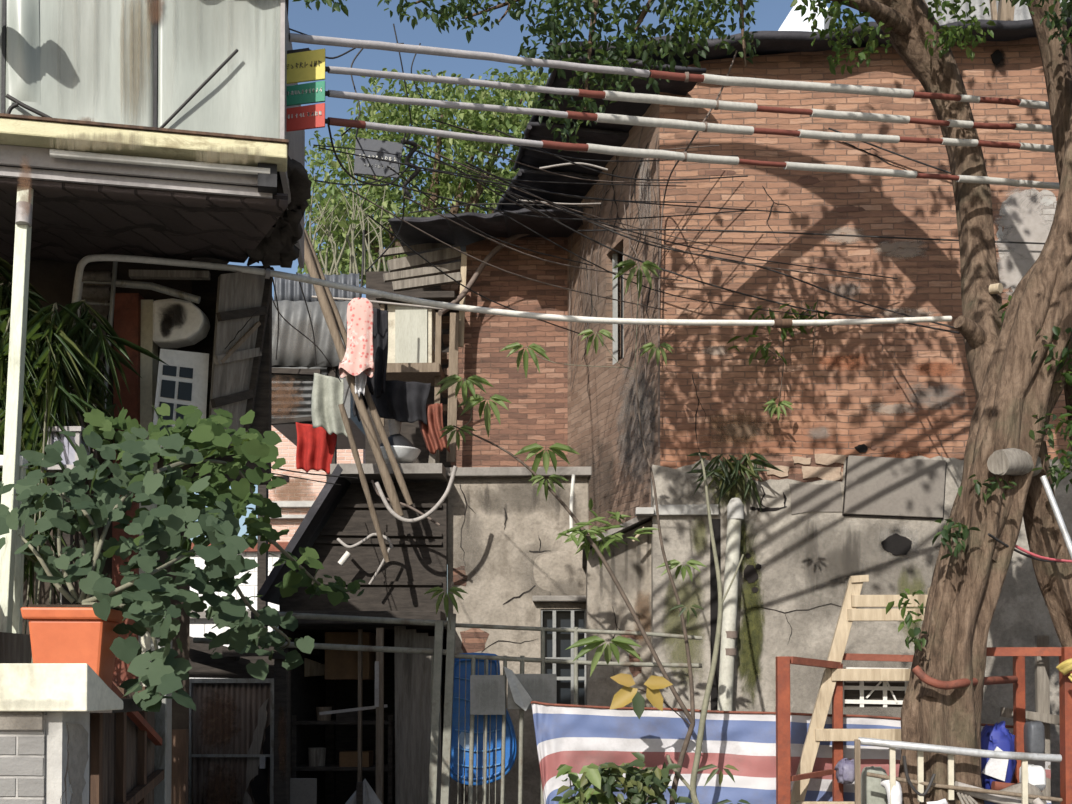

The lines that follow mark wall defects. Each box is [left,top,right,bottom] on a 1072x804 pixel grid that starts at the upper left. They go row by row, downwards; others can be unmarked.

rust [148,0,163,21]
spalling [741,452,847,482]
crack [503,585,551,605]
leakage [743,564,759,684]
crack [763,603,859,645]
crack [60,725,69,804]